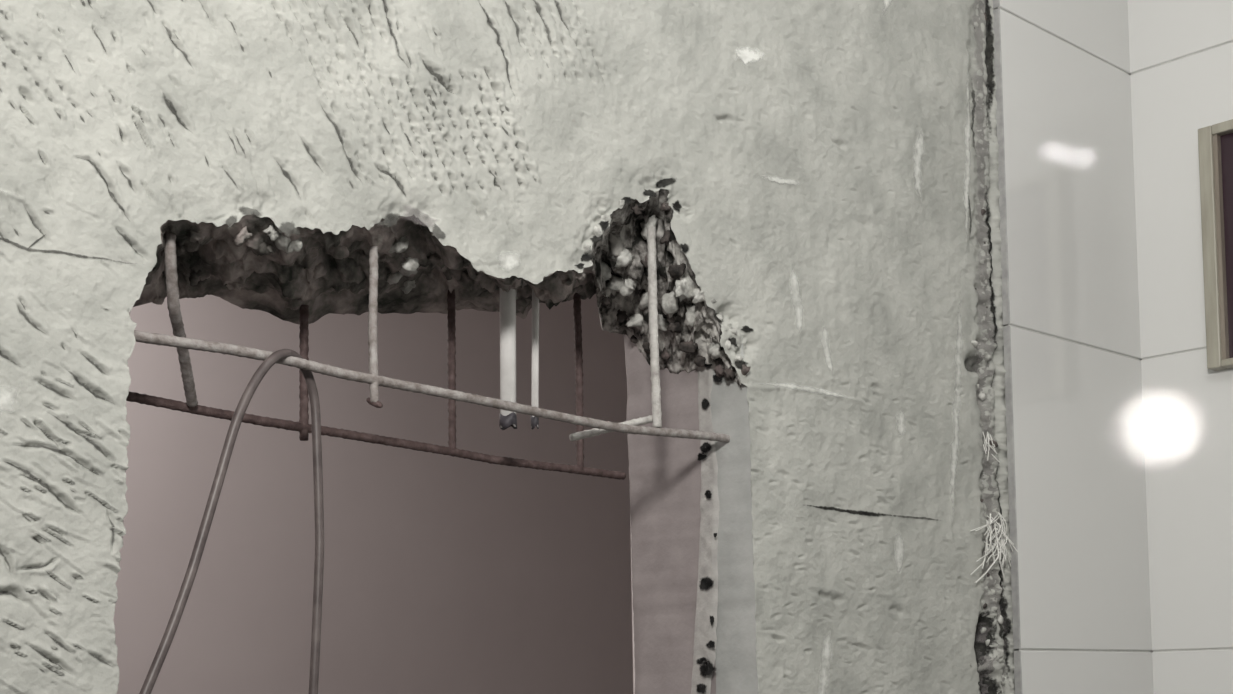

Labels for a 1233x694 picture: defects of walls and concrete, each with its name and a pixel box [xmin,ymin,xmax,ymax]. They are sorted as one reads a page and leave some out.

crack [971,0,995,147]
crack [0,235,108,260]
spalling [126,178,754,480]
crack [968,192,998,382]
crack [807,505,934,520]